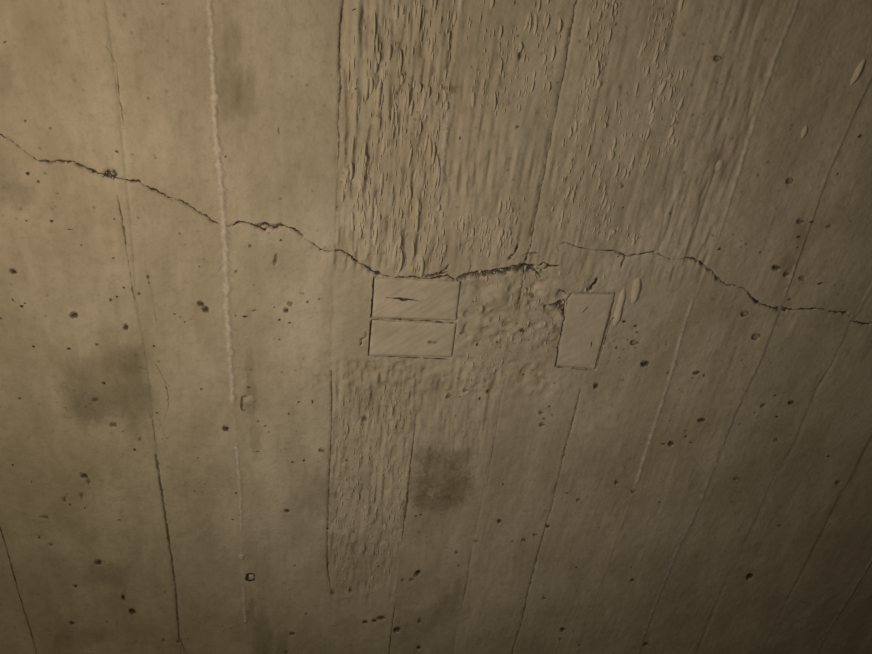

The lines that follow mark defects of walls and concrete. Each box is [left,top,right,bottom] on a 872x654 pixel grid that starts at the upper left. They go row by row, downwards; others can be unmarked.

crack [33,133,871,324]